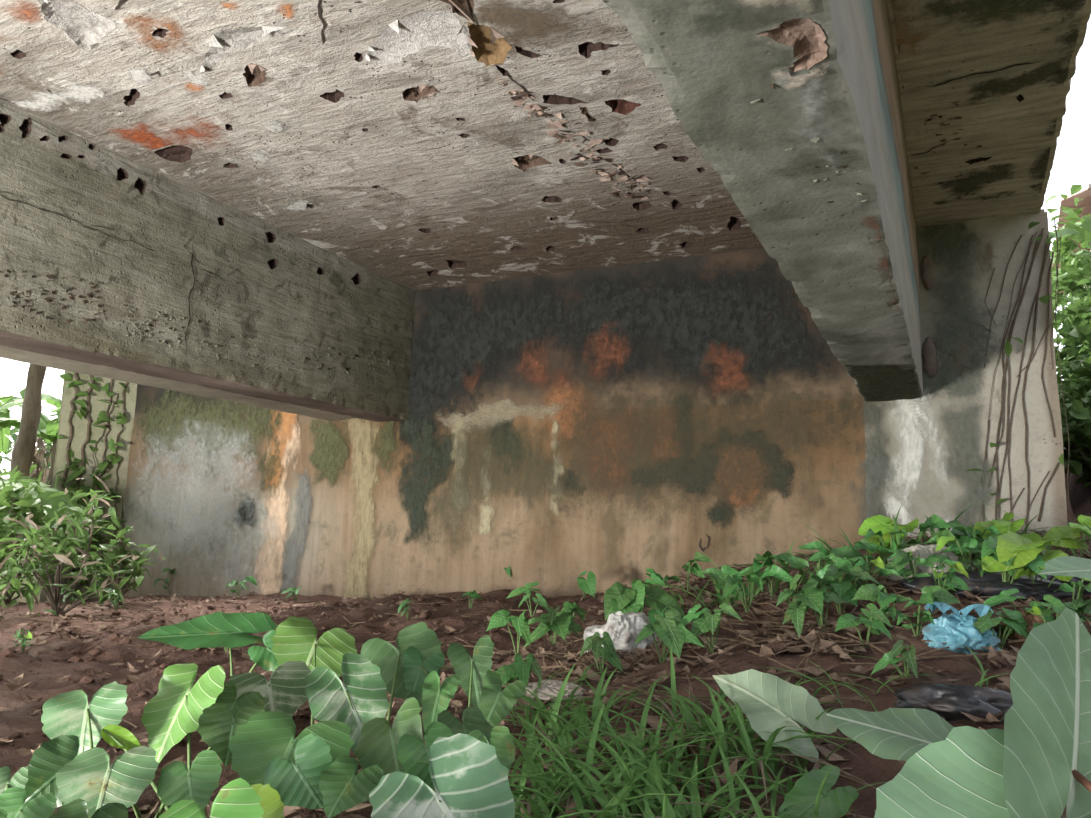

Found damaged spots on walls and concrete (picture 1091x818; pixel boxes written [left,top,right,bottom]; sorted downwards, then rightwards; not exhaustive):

corrosion [124,17,181,49]
crack [317,0,326,45]
crack [894,16,1048,89]
damp [925,0,1086,101]
spalling [0,114,95,159]
spalling [117,168,146,194]
corrosion [119,123,212,149]
spalling [354,0,682,211]
damp [1030,119,1057,190]
crack [0,191,156,252]
damp [136,222,996,599]
corrosion [265,409,296,488]